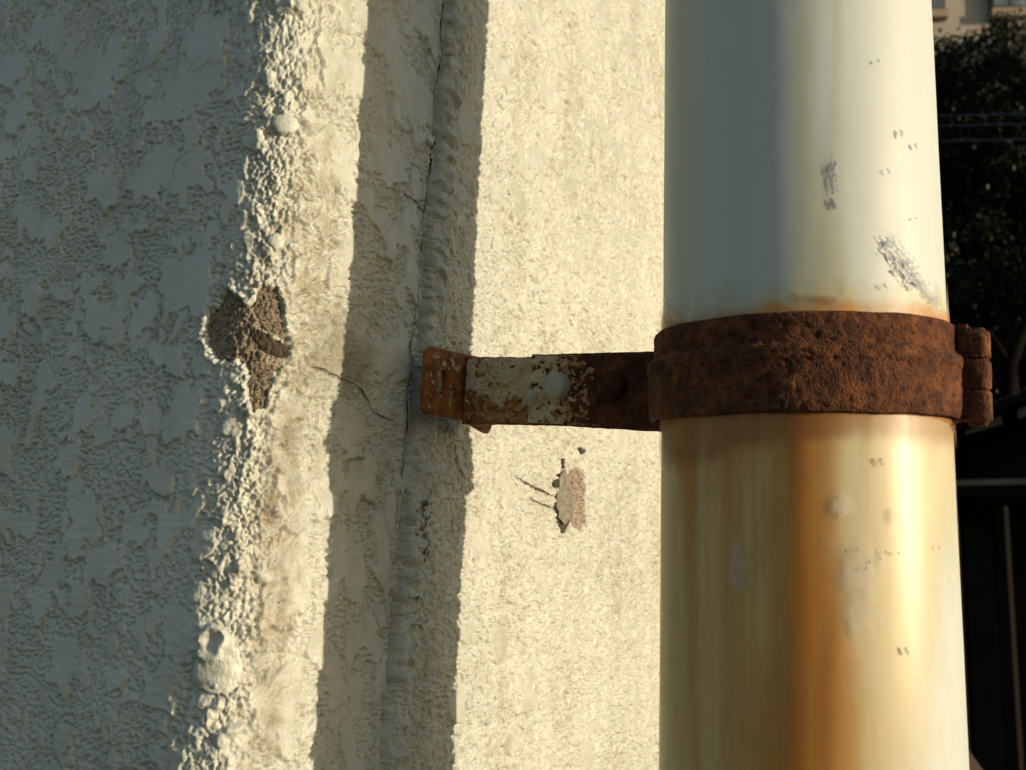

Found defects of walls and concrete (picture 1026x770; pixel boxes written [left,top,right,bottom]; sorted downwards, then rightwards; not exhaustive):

crack [403,3,444,262]
flaking render [207,286,291,411]
crack [293,287,420,525]
corrosion [661,306,682,330]
corrosion [759,298,794,313]
corrosion [913,303,950,321]
flaking render [553,458,586,533]
corrosion [659,411,955,770]